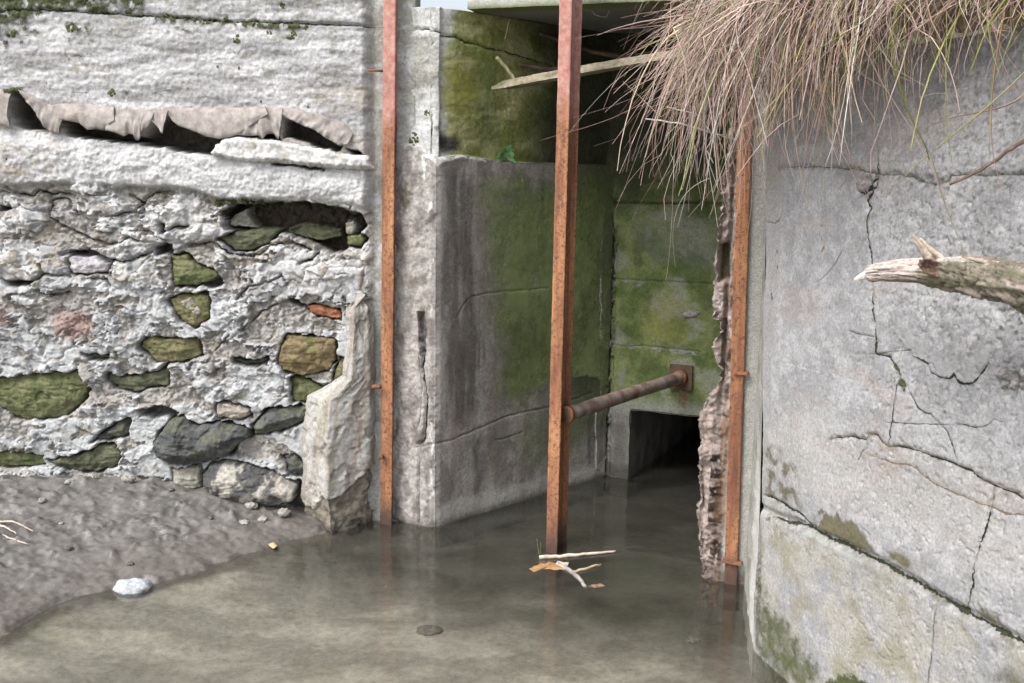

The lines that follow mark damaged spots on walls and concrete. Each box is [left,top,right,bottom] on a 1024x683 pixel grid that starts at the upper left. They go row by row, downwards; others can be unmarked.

flaking render [0,90,376,170]
spalling [221,202,368,250]
spalling [721,178,731,279]
crack [780,166,1024,258]
spalling [715,320,728,374]
spalling [304,469,373,526]
spalling [701,403,722,568]
water stain [766,448,797,503]
crack [768,296,1024,677]
water stain [818,509,872,550]
water stain [890,553,909,568]